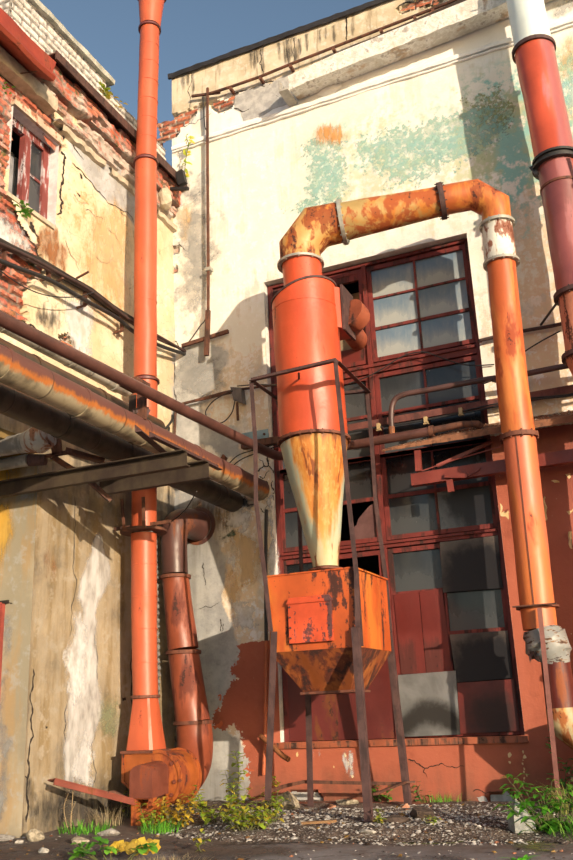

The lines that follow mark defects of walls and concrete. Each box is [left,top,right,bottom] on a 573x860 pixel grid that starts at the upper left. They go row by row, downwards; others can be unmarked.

leakage [277,34,308,63]
spalling [157,107,201,147]
flaking render [0,75,62,321]
crack [57,136,134,264]
crack [30,222,42,258]
leakage [30,535,131,826]
crack [408,759,461,776]